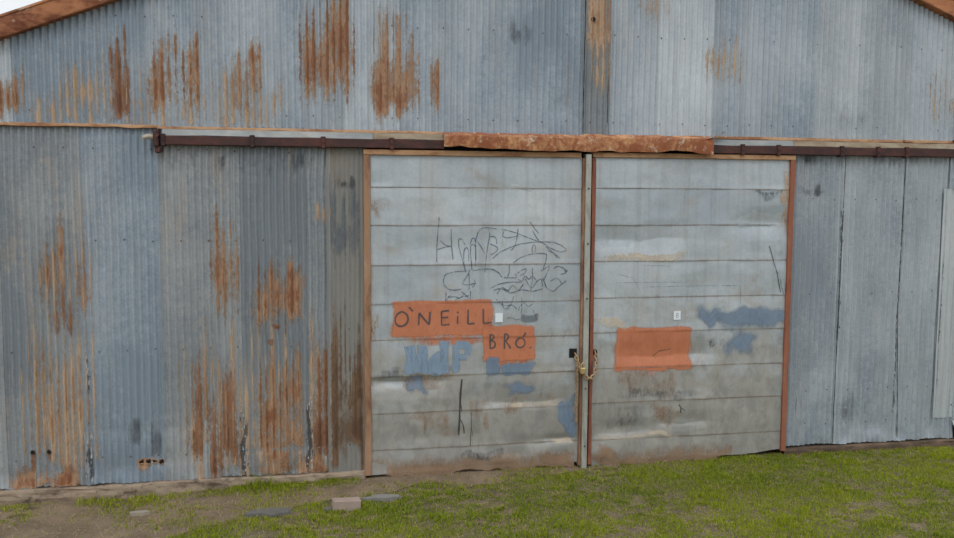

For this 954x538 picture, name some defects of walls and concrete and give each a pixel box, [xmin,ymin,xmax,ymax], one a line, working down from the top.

rust [0,66,24,119]
rust [35,26,282,127]
rust [299,0,355,103]
rust [370,12,440,120]
rust [586,0,611,93]
rust [9,214,98,490]
rust [184,210,364,480]